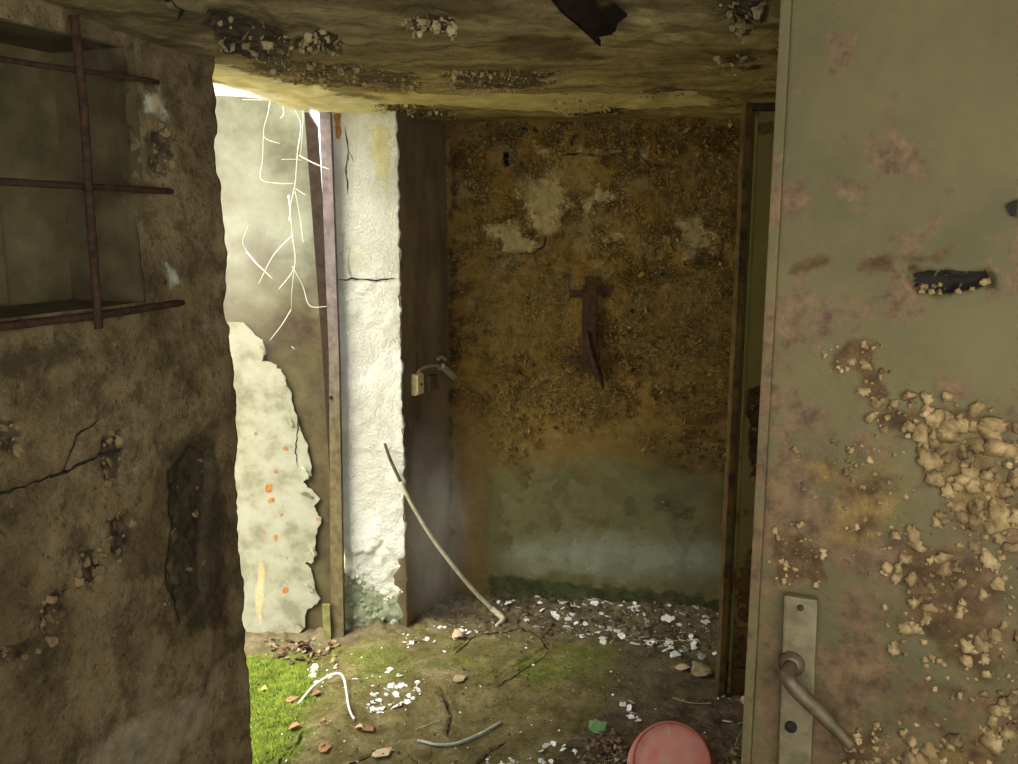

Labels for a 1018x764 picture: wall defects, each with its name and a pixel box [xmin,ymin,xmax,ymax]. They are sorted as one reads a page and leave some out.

crack [165,0,185,21]
spalling [203,11,740,160]
crack [340,247,396,282]
crack [0,419,124,495]
leakage [514,537,719,572]